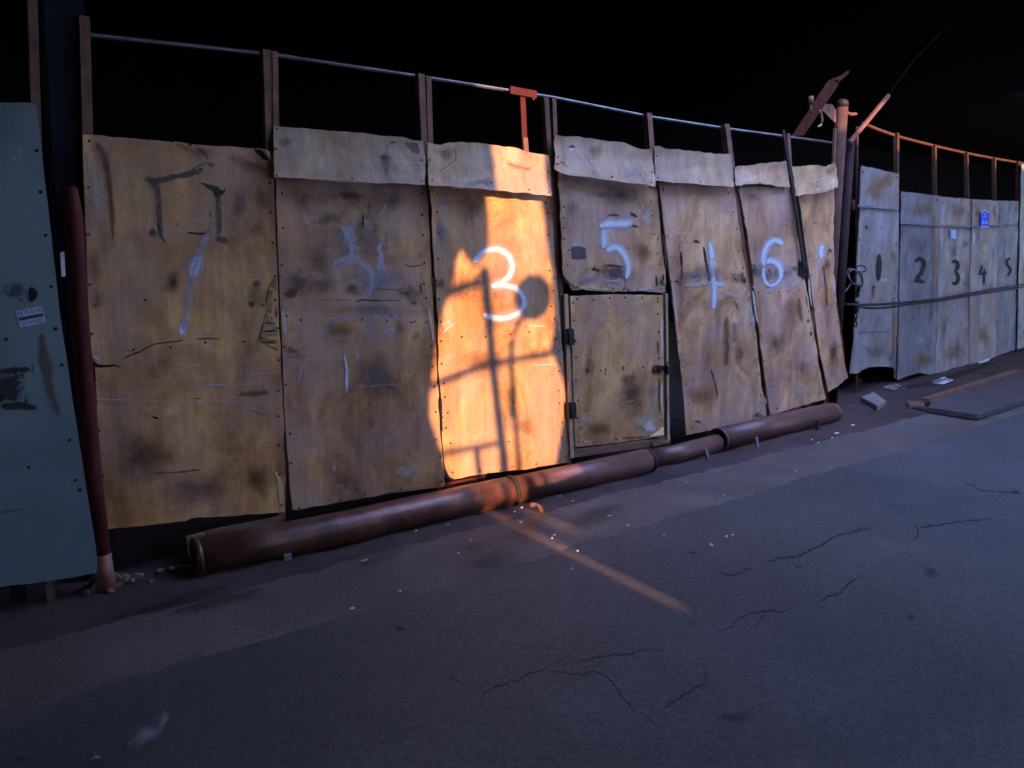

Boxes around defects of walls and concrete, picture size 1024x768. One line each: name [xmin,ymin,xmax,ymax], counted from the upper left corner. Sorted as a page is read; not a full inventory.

crack [720,527,871,576]
crack [913,519,987,542]
crack [450,648,710,727]